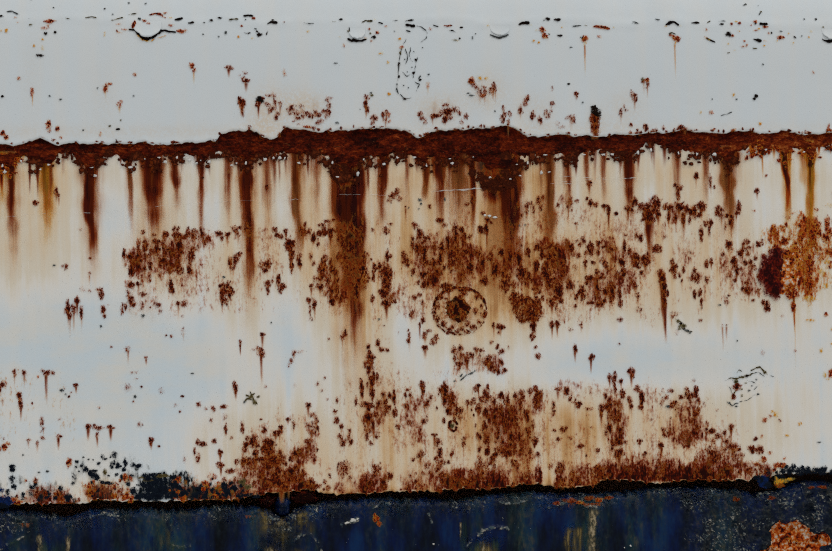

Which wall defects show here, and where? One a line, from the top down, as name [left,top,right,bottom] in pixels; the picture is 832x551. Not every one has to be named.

peeling [132,21,162,37]
peeling [348,28,366,39]
corrosion [467,76,497,98]
corrosion [0,83,832,354]
corrosion [85,424,115,443]
corrosion [169,332,786,506]
peeling [0,464,73,509]
corrosion [16,473,134,506]
peeling [72,452,260,502]
corrosion [764,520,831,551]